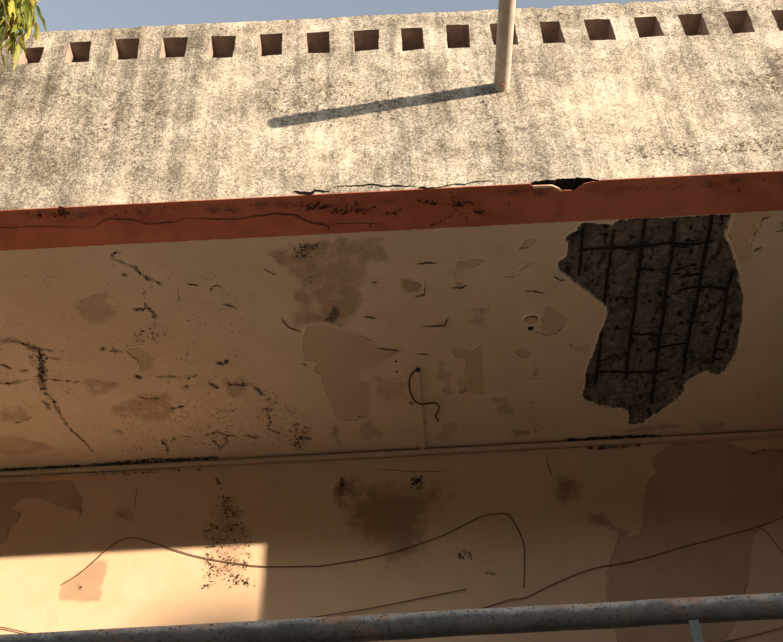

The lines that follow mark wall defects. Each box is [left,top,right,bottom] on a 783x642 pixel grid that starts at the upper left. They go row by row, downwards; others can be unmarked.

crack [0,180,499,233]
crack [102,251,190,354]
spalling [552,211,777,428]
crack [0,331,775,477]
leakage [3,382,312,589]
peeling [605,441,783,602]
peeling [613,621,737,642]